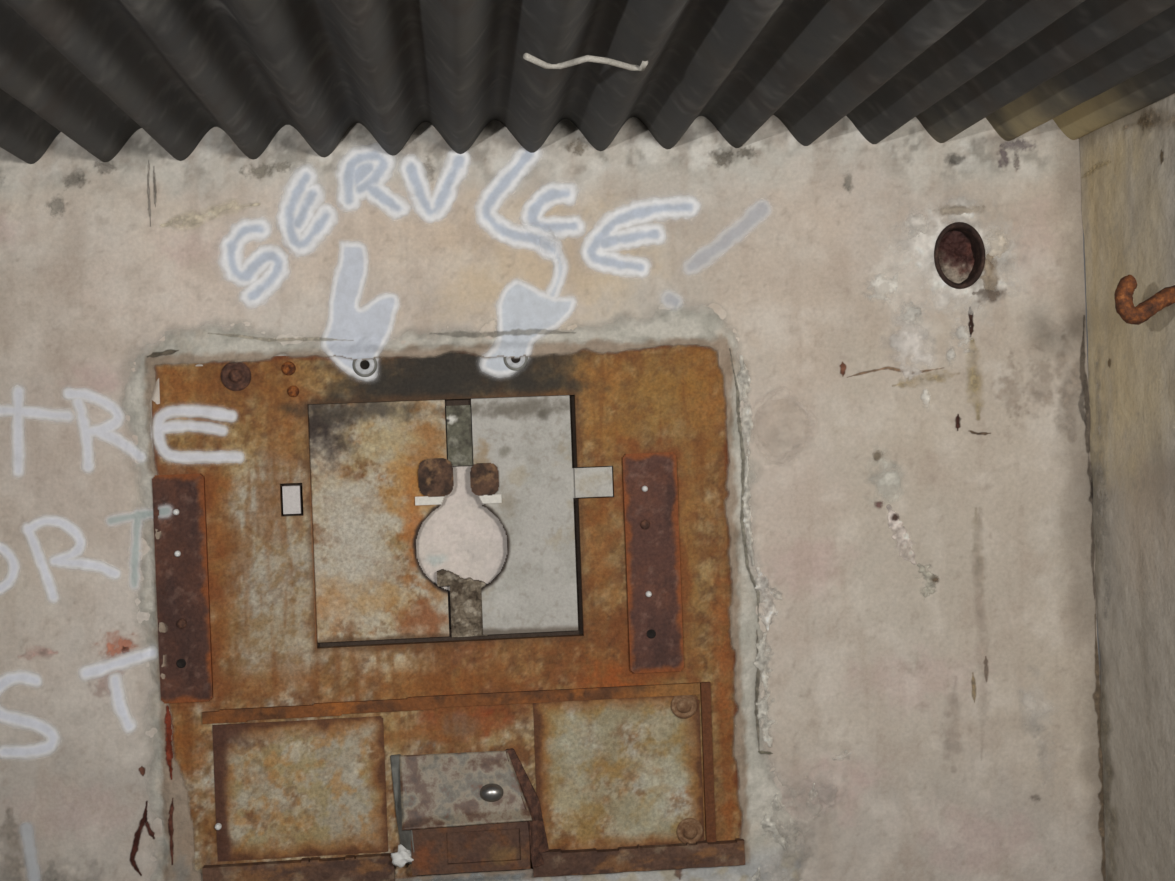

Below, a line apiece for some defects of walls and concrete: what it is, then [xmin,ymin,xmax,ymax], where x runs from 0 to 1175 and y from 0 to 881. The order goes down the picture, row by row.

crack [729,348,773,754]
crack [130,706,175,876]